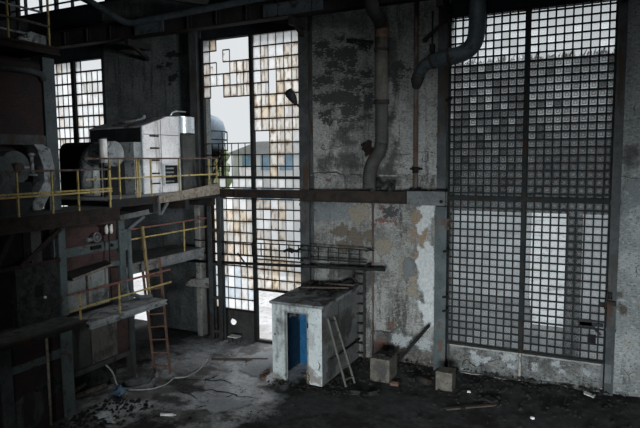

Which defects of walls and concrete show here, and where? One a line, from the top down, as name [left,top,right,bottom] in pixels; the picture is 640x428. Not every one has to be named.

damp [317,153,361,172]
peeling [330,203,393,254]
peeling [409,209,428,259]
spalling [375,336,434,367]
crack [181,377,253,408]